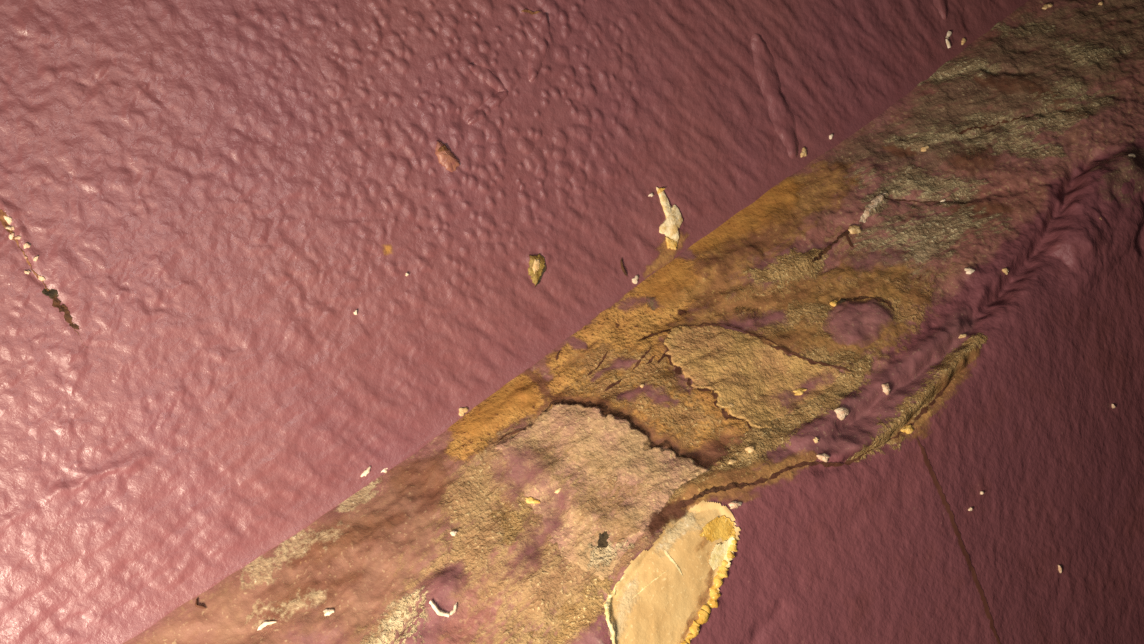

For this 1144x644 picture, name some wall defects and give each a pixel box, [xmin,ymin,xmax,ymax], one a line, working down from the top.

crack [0,209,87,348]
peeling [528,254,546,287]
peeling [648,187,695,259]
peeling [664,310,840,432]
crack [768,344,852,373]
crack [496,428,526,443]
crack [667,376,955,515]
peeling [495,396,741,644]